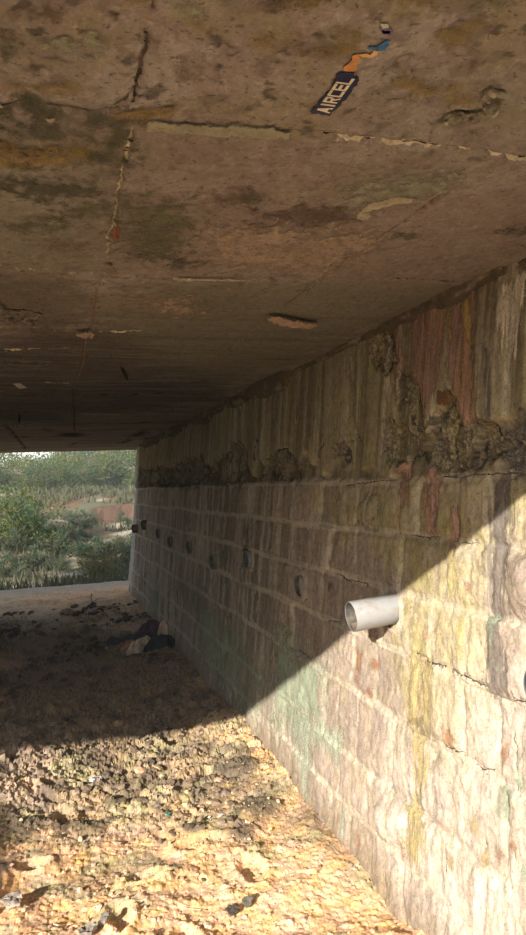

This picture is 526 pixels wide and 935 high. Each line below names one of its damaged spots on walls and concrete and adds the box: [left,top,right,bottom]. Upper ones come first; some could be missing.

crack [1,30,150,111]
crack [0,127,204,396]
spalling [267,316,318,329]
corrosion [393,291,477,425]
damp [495,272,526,373]
crack [417,652,488,687]